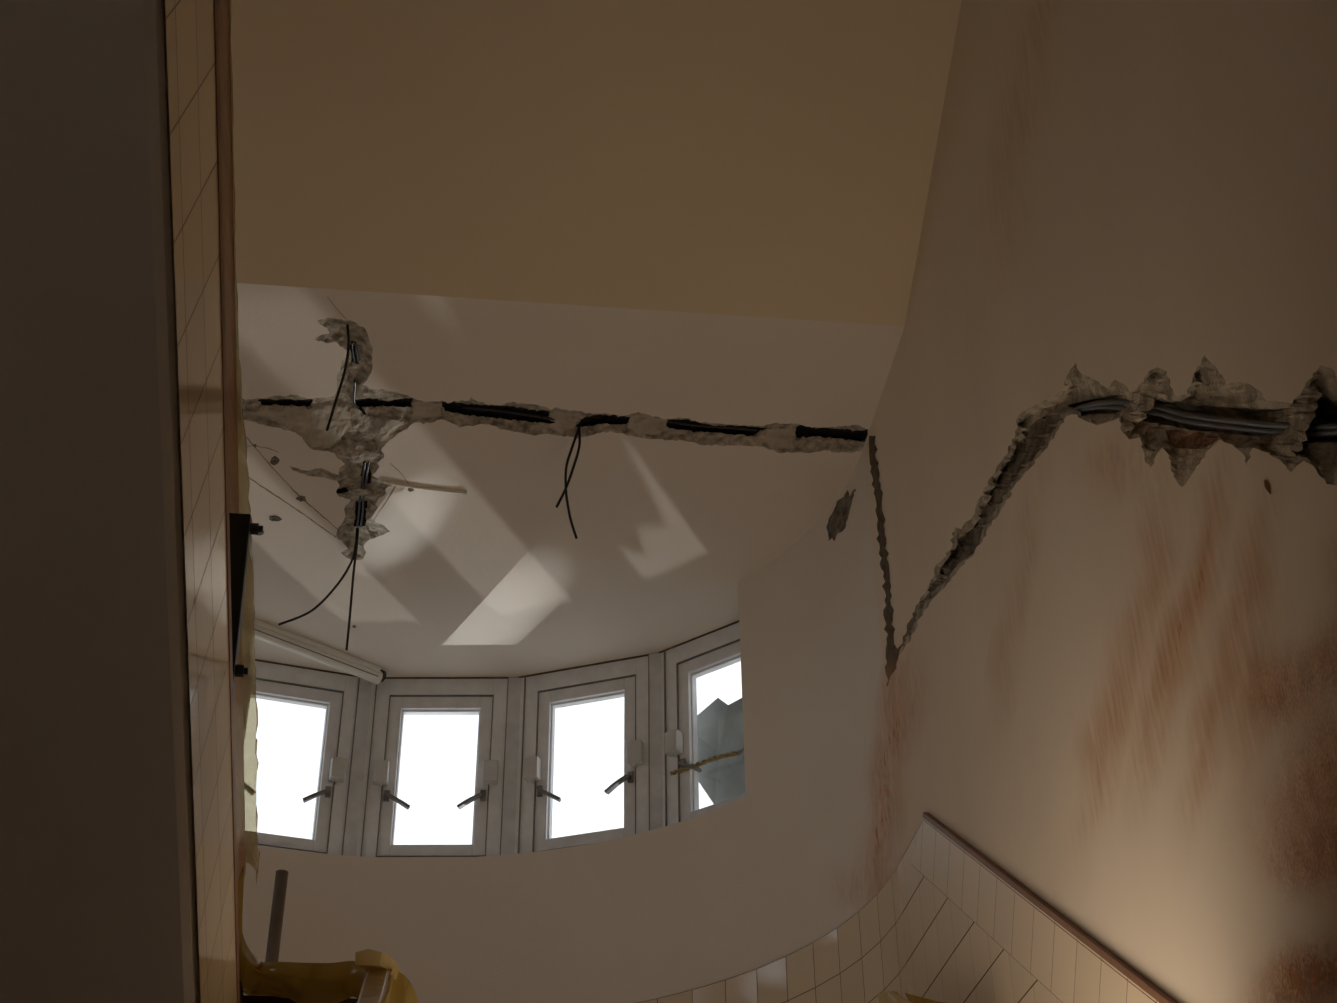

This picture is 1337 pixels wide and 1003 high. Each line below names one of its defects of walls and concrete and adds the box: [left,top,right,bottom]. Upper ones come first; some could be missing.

flaking render [826,489,856,541]